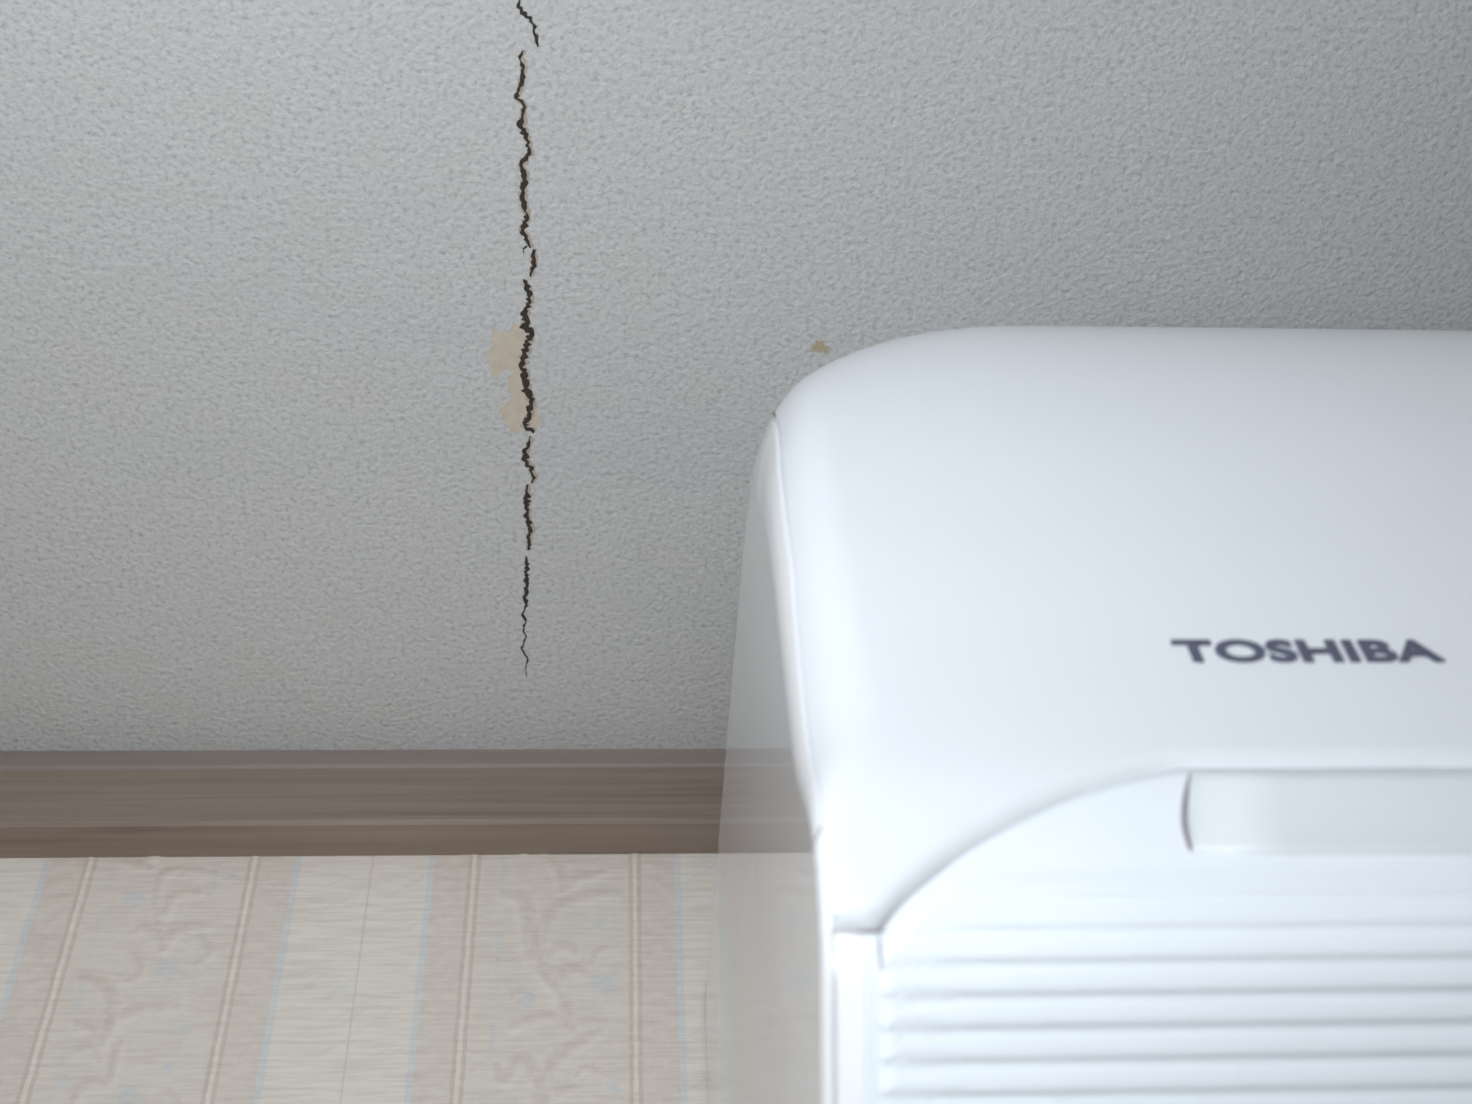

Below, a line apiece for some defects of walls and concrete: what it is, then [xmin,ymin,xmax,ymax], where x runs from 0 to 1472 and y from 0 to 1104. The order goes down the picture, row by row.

peeling [488,321,542,434]
crack [513,0,539,678]